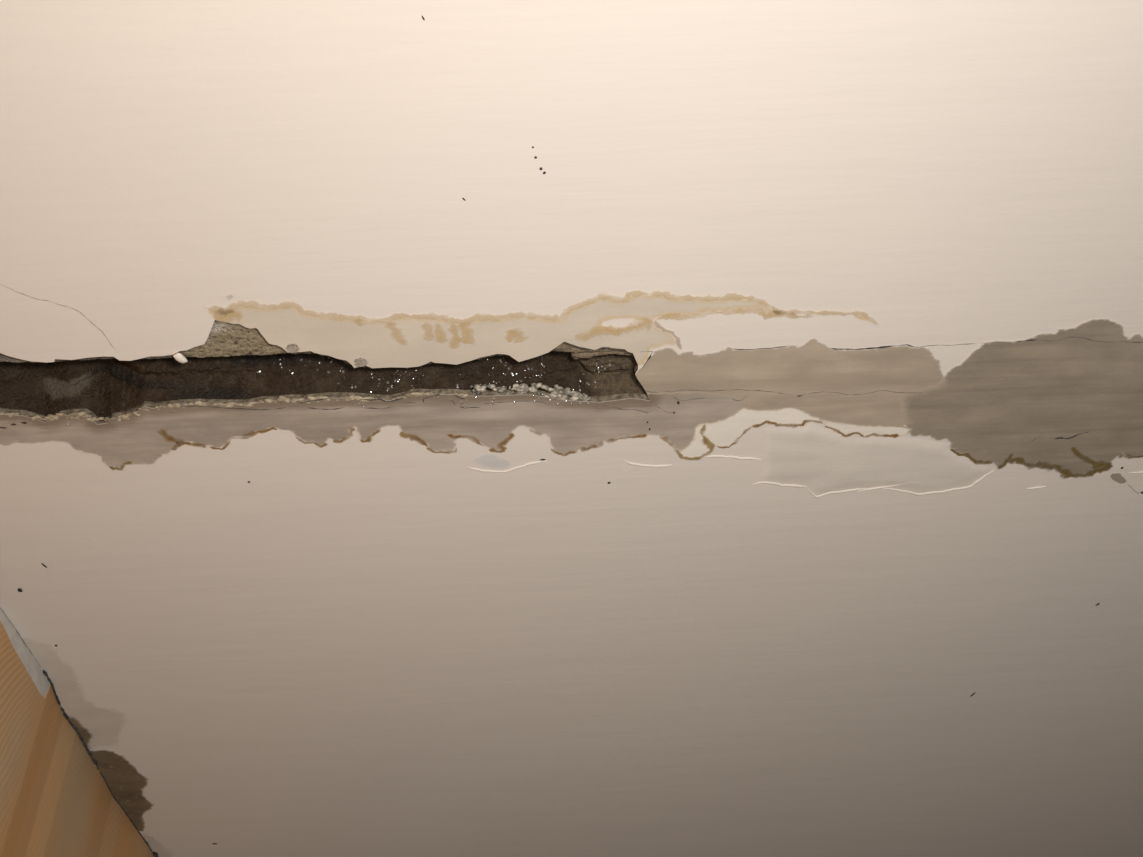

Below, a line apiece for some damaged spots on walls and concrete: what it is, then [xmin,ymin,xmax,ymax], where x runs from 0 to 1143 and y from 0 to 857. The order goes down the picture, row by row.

spalling [0,320,647,429]